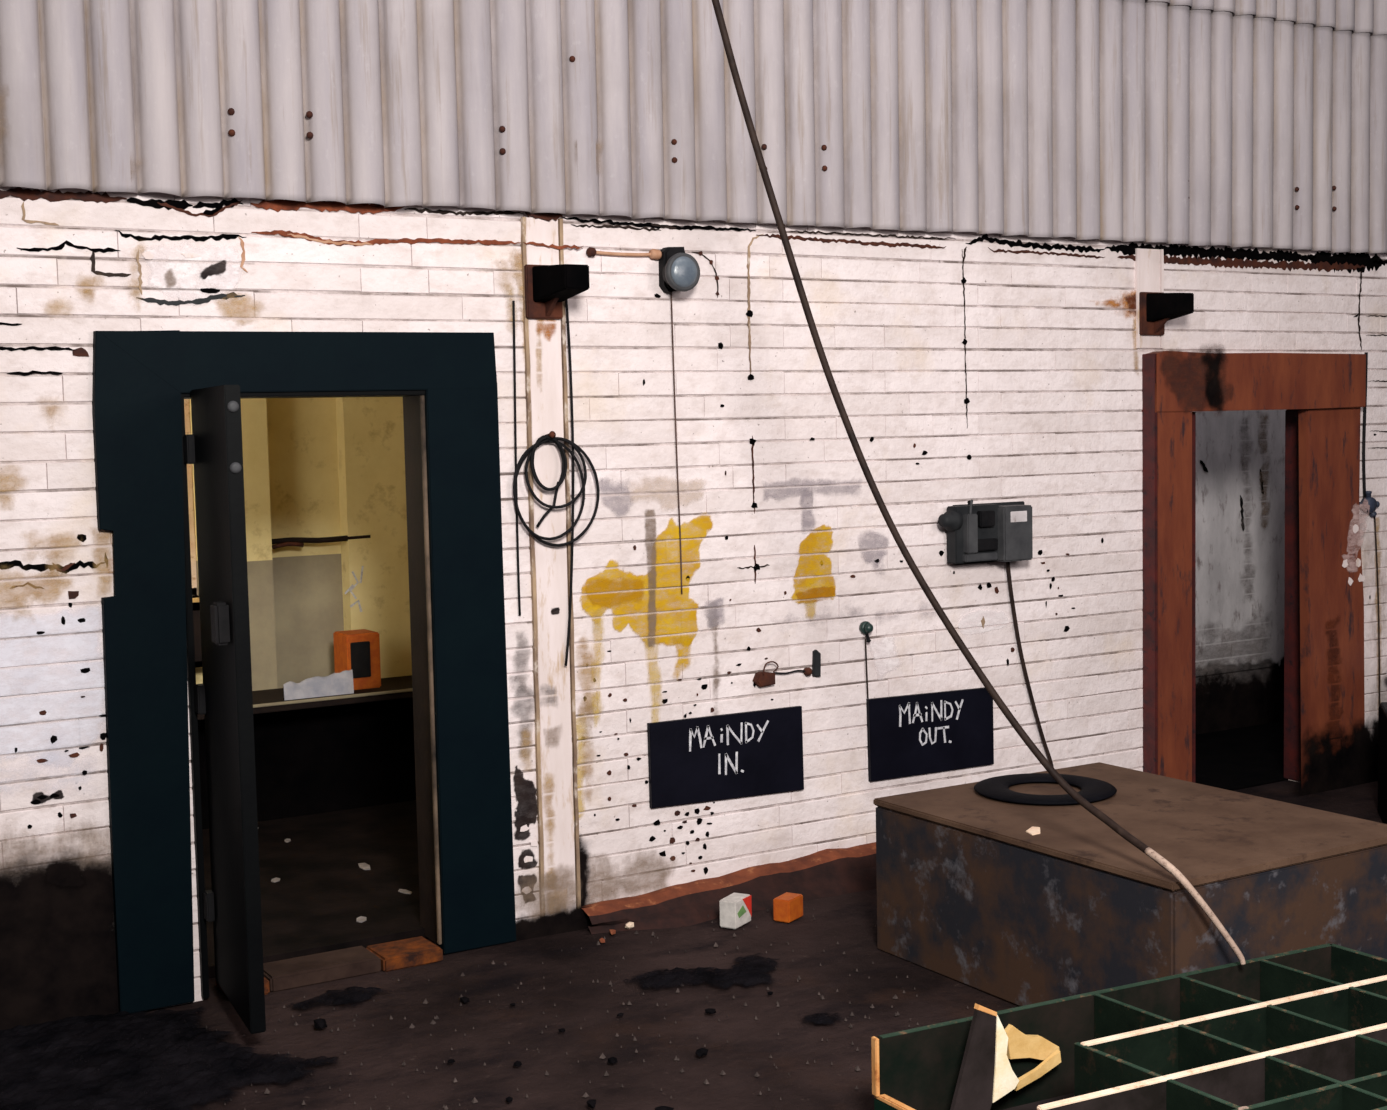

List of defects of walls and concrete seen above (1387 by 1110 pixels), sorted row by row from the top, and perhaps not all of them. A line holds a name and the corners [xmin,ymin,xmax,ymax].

crack [0,187,1387,460]
rust [1106,291,1137,369]
crack [737,436,768,584]
spalling [61,591,86,625]
spalling [31,714,106,818]